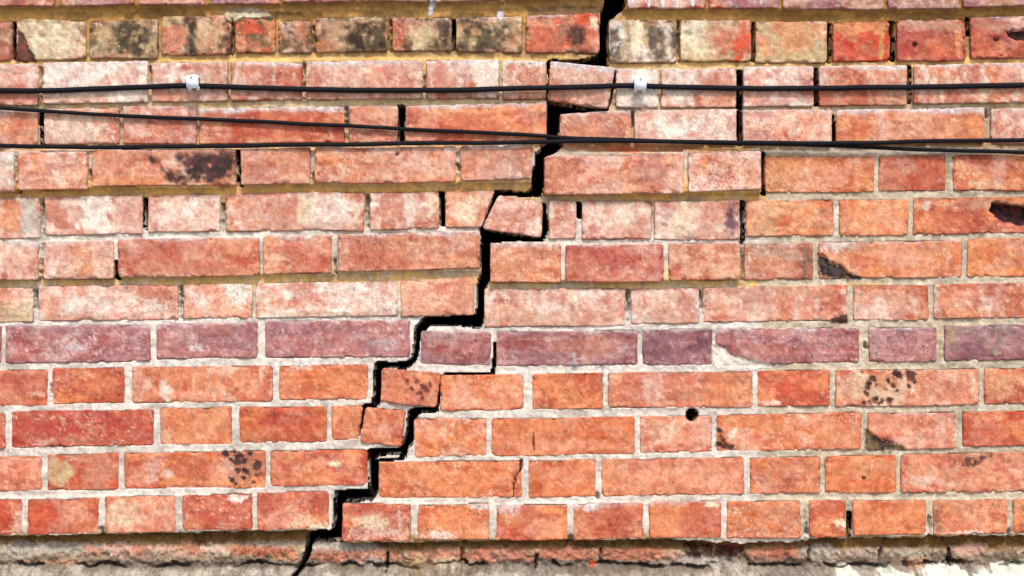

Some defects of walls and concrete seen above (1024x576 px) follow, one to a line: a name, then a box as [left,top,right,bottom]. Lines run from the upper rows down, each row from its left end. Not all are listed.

damp [149,149,236,183]
spalling [989,204,1024,226]
spalling [818,254,861,279]
crack [292,0,625,576]